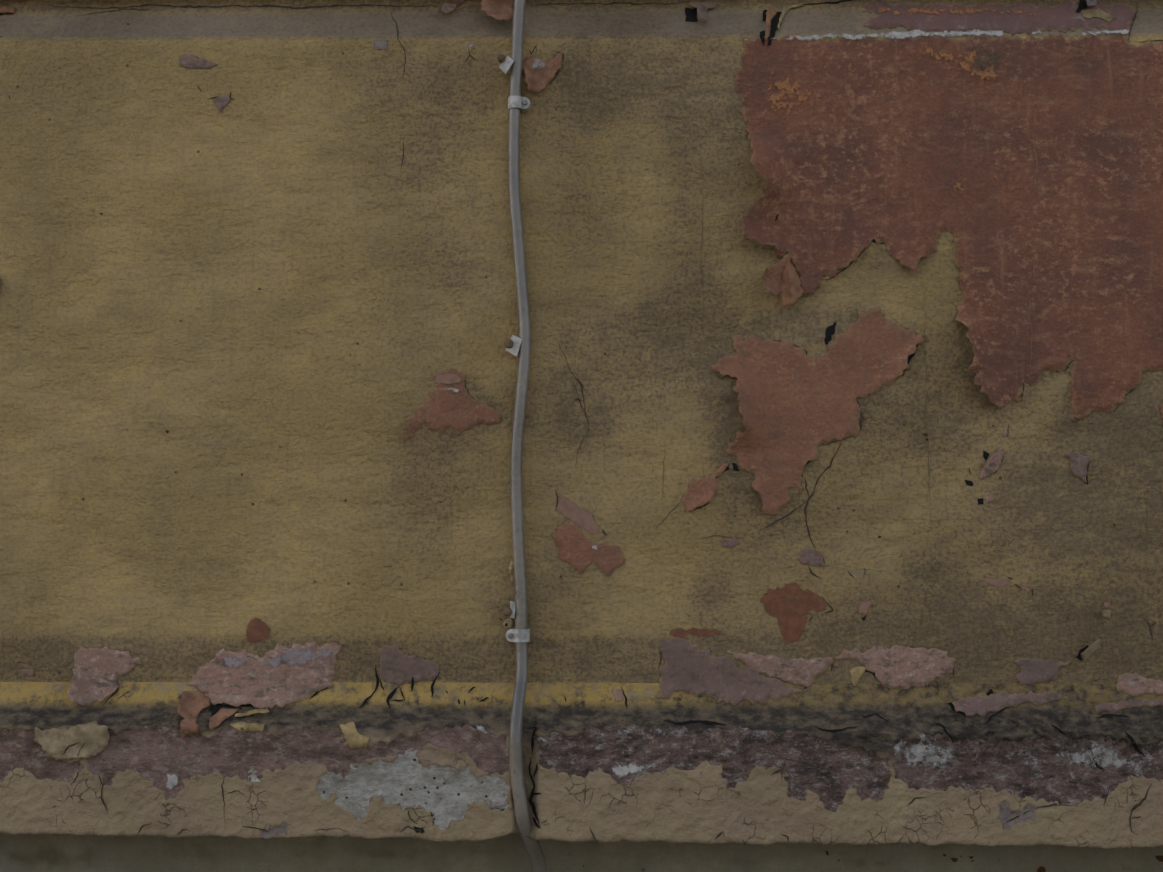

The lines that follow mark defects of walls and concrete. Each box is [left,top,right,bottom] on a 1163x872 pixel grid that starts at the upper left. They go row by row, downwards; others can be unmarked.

peeling [734,0,1163,423]
peeling [655,306,924,530]
crack [221,772,268,832]
peeling [0,641,510,834]
crack [529,727,541,829]
crack [663,718,726,726]
peeling [656,637,957,705]
peeling [533,722,1163,830]
crack [815,713,888,732]
peeling [948,689,1065,717]
crack [1095,714,1144,756]
crack [1091,749,1152,835]